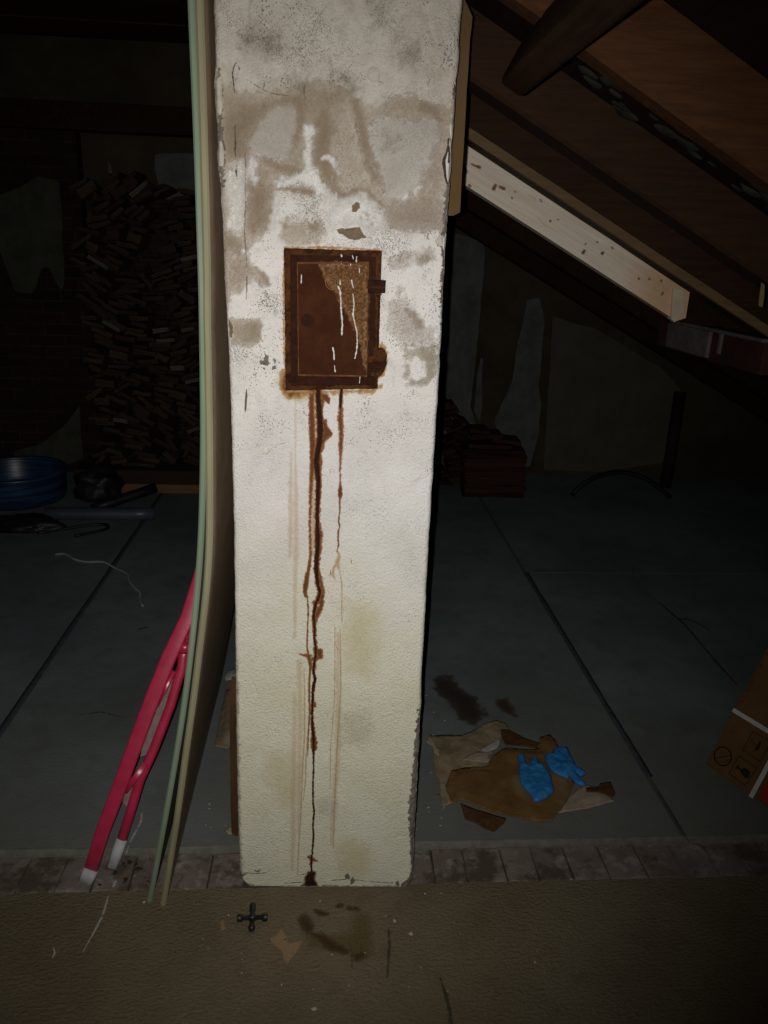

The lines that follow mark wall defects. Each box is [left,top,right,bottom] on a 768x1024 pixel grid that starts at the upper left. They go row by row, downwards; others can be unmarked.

water stain [215,80,451,302]
spalling [336,225,366,240]
water stain [229,319,261,347]
water stain [390,303,437,384]
corrosion [279,246,388,886]